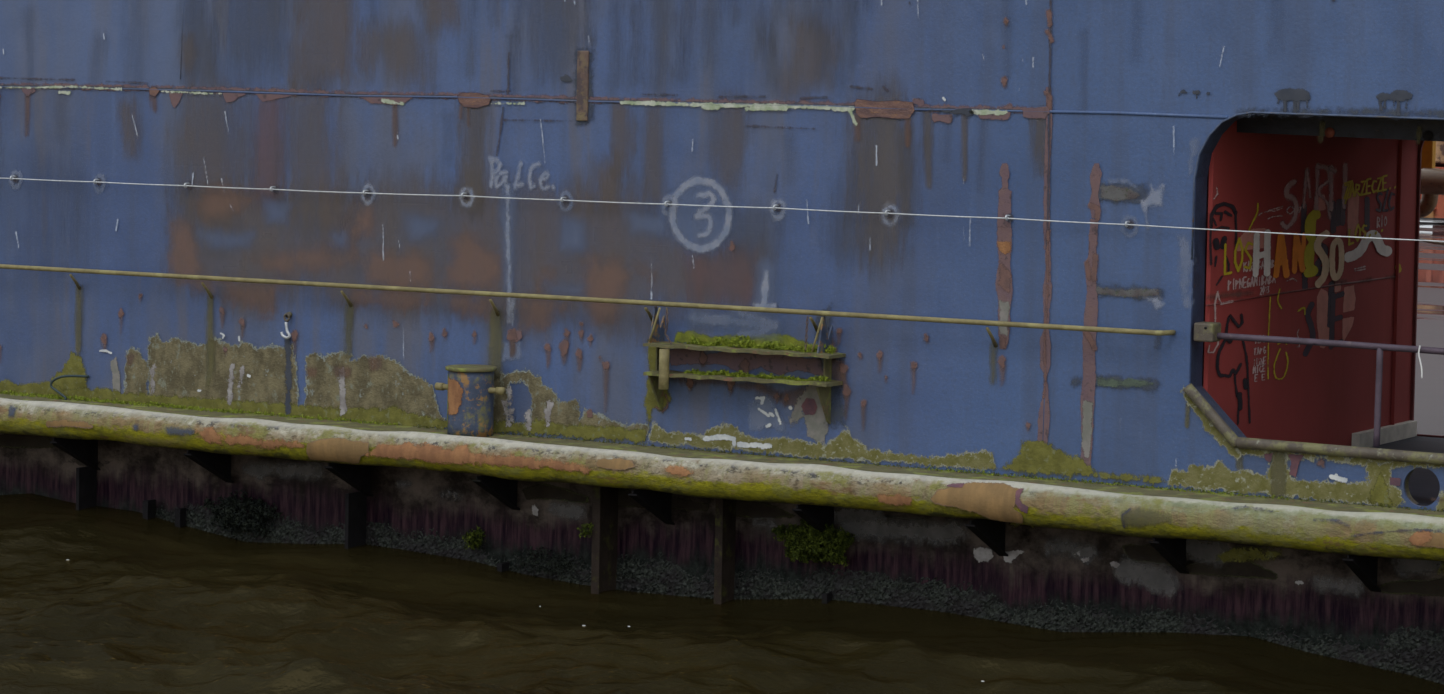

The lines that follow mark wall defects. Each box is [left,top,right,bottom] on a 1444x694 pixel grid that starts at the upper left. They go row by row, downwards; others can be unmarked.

corrosion [1,48,1053,444]
corrosion [1080,163,1102,466]
peeling [99,332,446,421]
peeling [494,329,649,436]
corrosion [196,427,591,475]
peeling [596,458,635,471]